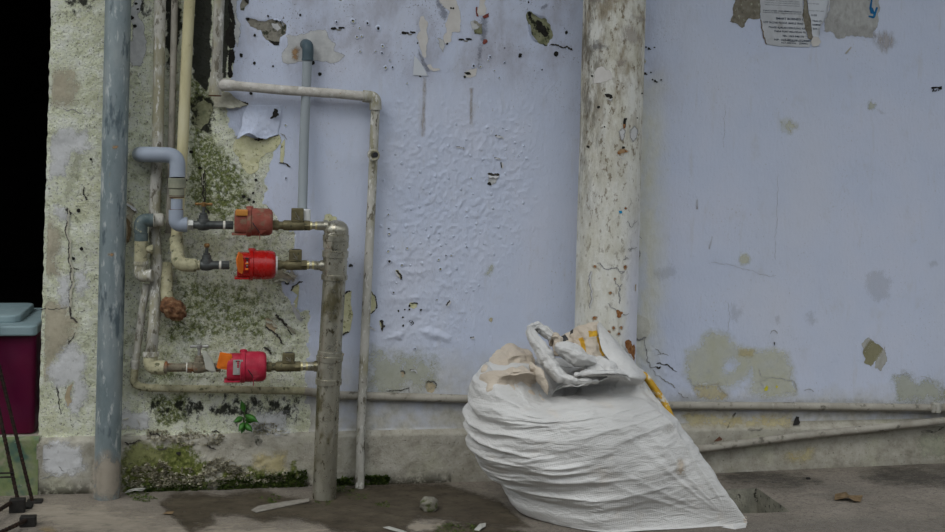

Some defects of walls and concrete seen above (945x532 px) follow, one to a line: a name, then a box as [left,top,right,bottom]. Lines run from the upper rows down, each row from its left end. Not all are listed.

spalling [231,0,286,57]
spalling [526,1,558,57]
peeling [233,92,290,174]
spalling [342,290,353,336]
spalling [371,292,385,332]
peeling [862,338,887,371]
crack [644,340,736,428]